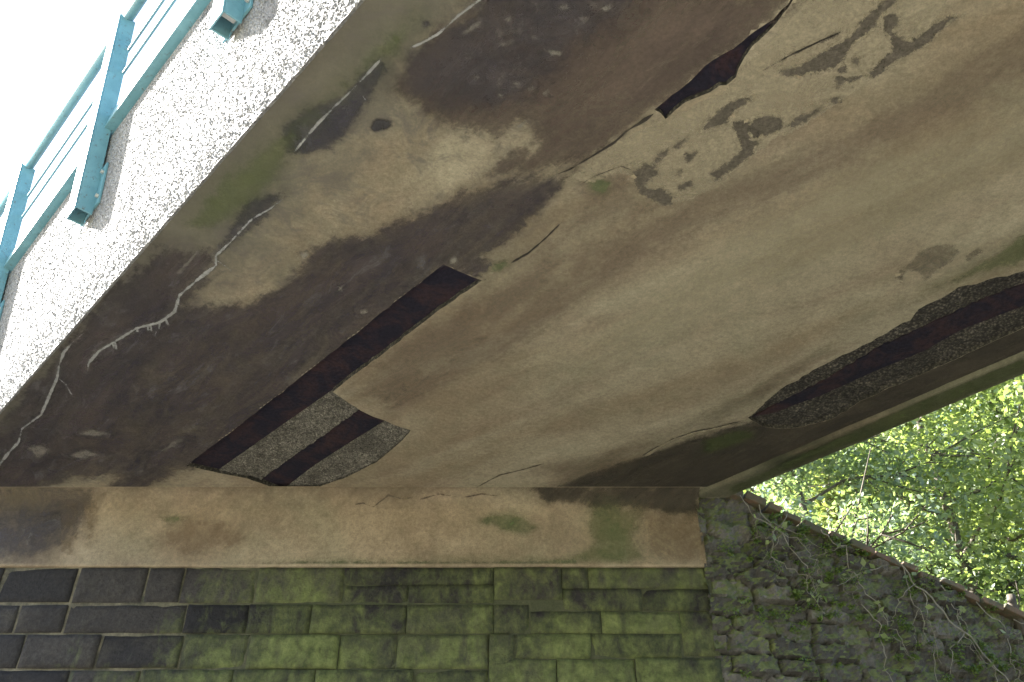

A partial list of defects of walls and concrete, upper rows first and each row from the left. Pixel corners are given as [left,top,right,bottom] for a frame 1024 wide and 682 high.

crack [0,199,283,464]
spalling [191,266,477,486]
crack [294,60,380,152]
damp [0,0,794,557]
crack [511,224,560,263]
crack [558,114,653,183]
peeling [571,0,966,206]
spalling [751,271,1024,425]